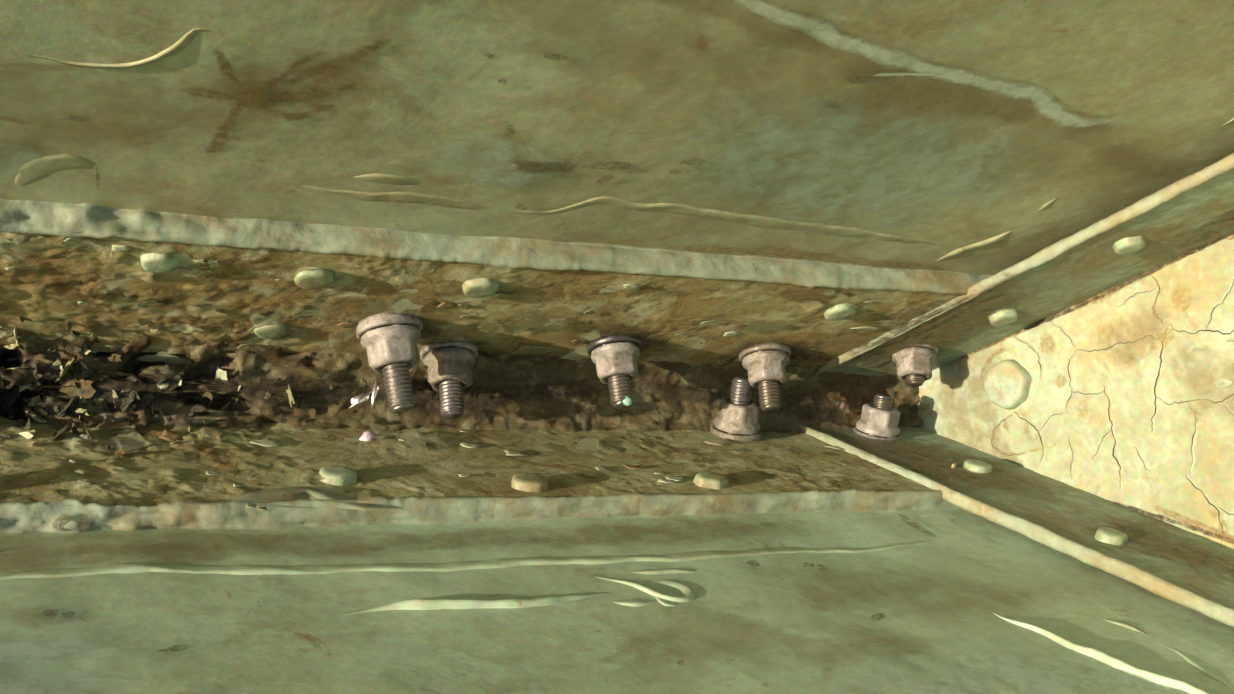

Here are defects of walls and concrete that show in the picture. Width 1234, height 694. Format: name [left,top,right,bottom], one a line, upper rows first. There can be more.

corrosion [188,41,384,152]
peeling [106,297,227,333]
peeling [226,310,284,358]
crack [991,275,1234,543]